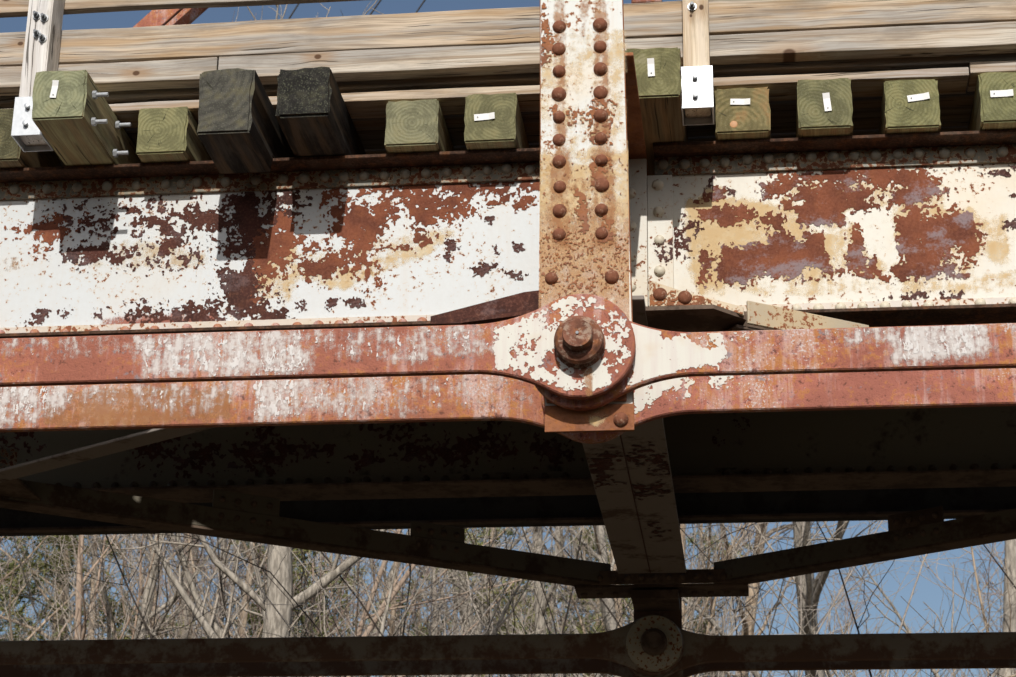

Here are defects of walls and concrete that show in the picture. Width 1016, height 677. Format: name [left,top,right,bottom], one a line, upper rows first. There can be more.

rust [4,2,629,324]
peeling [917,164,1016,177]
rust [653,166,1012,295]
peeling [443,238,461,262]
peeling [469,244,529,280]
peeling [650,283,743,314]
peeling [876,289,965,301]
rust [15,308,73,327]
peeling [126,296,752,422]